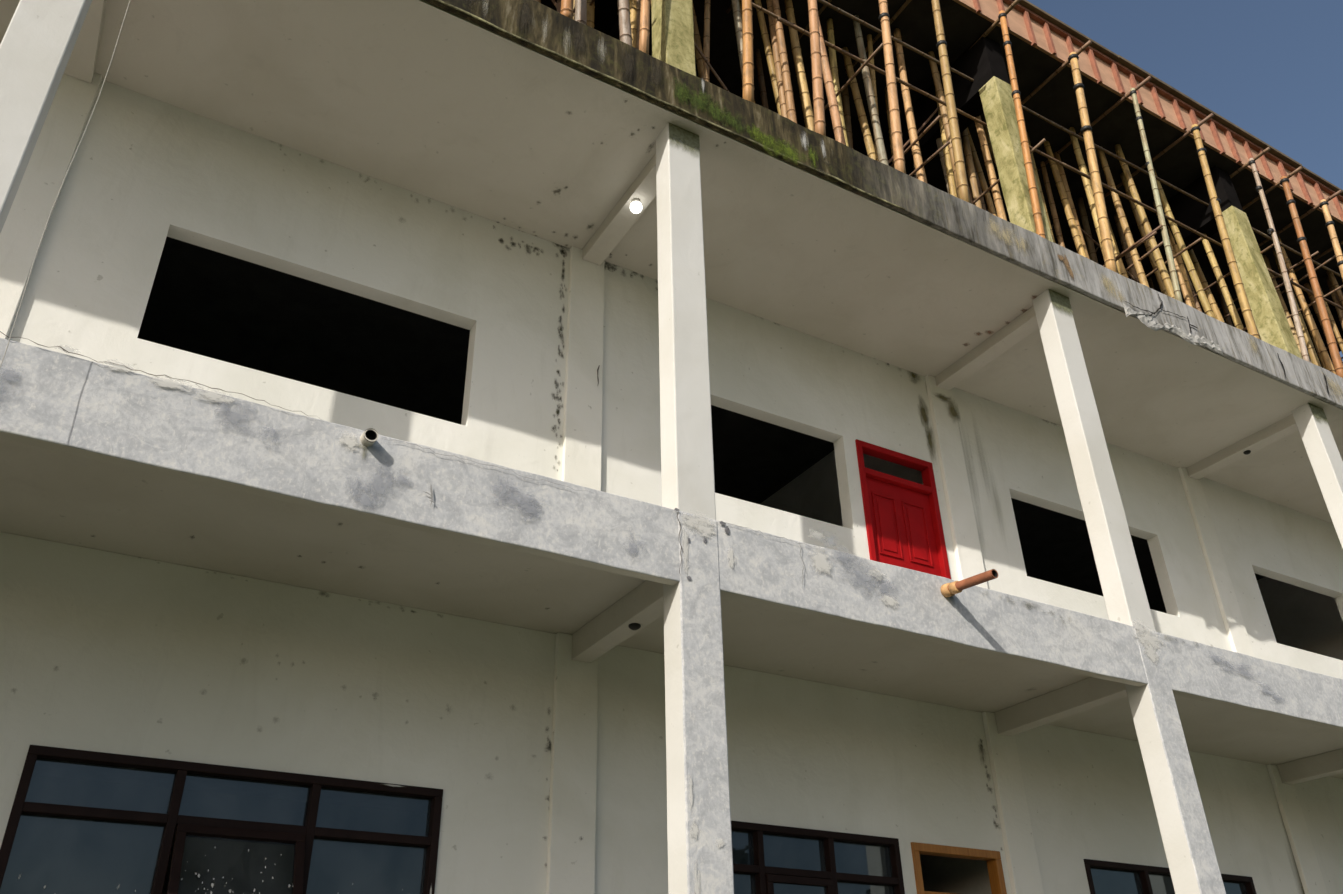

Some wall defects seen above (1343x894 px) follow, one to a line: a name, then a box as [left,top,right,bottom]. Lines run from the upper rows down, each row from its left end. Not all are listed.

crack [0,331,332,423]
damp [500,226,591,445]
crack [1125,294,1197,333]